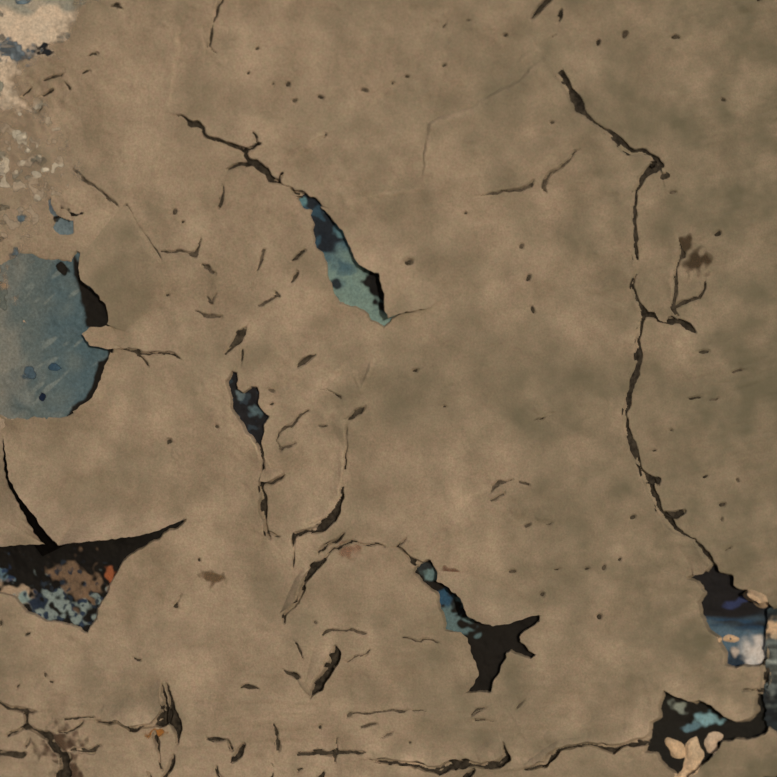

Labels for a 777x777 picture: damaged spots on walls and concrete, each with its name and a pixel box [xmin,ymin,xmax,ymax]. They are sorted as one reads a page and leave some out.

crack [531,0,563,21]
peeling [0,0,84,242]
peeling [0,205,161,420]
crack [177,115,304,208]
peeling [299,193,448,326]
crack [558,70,715,570]
crack [0,684,183,777]
peeling [0,433,188,632]
crack [256,407,420,623]
crack [273,724,654,777]
peeling [415,560,542,695]
peeling [647,544,777,777]